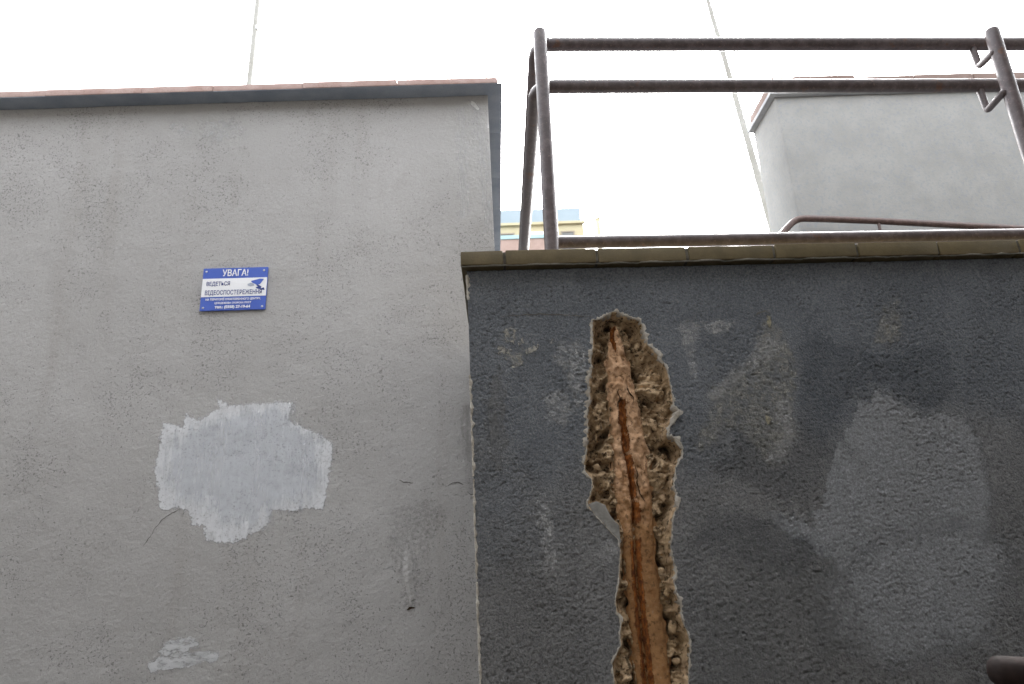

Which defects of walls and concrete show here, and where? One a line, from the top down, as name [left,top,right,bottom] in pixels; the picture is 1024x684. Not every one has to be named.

rust [618,398,642,525]
spalling [581,309,692,684]
rust [629,537,654,684]